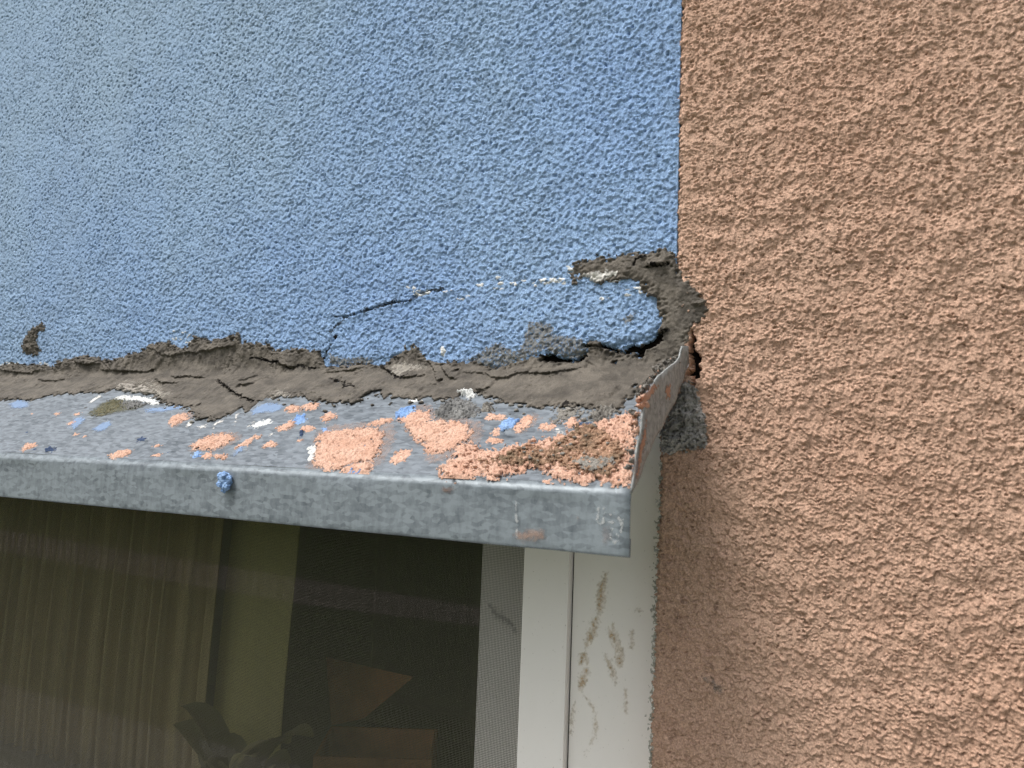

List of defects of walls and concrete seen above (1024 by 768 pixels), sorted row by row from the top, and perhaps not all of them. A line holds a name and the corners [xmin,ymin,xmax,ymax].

peeling [406,266,574,301]
crack [249,286,444,389]
peeling [464,322,589,369]
crack [217,379,254,402]
peeling [301,402,321,411]